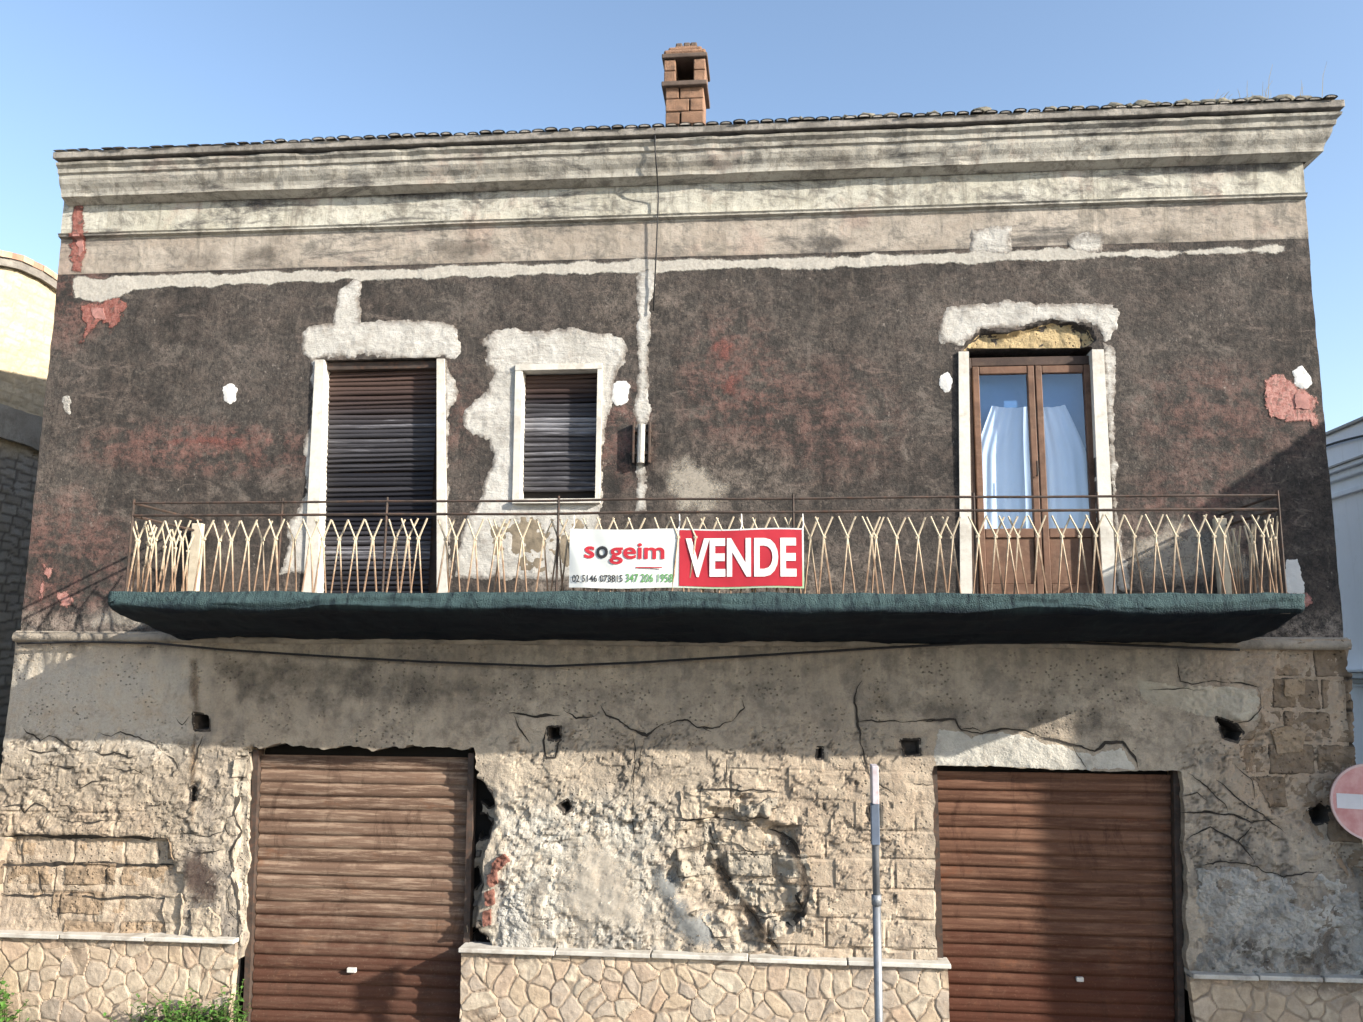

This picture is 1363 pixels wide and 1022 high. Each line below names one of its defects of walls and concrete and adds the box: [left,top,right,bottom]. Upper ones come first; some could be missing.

peeling [68,205,87,272]
peeling [79,297,128,344]
spalling [963,323,1094,351]
peeling [1264,374,1320,429]
crack [1,717,254,936]
spalling [473,787,510,942]
crack [511,700,745,839]
crack [675,762,810,949]
crack [853,681,1138,794]
crack [1153,660,1262,723]
crack [1178,763,1315,882]